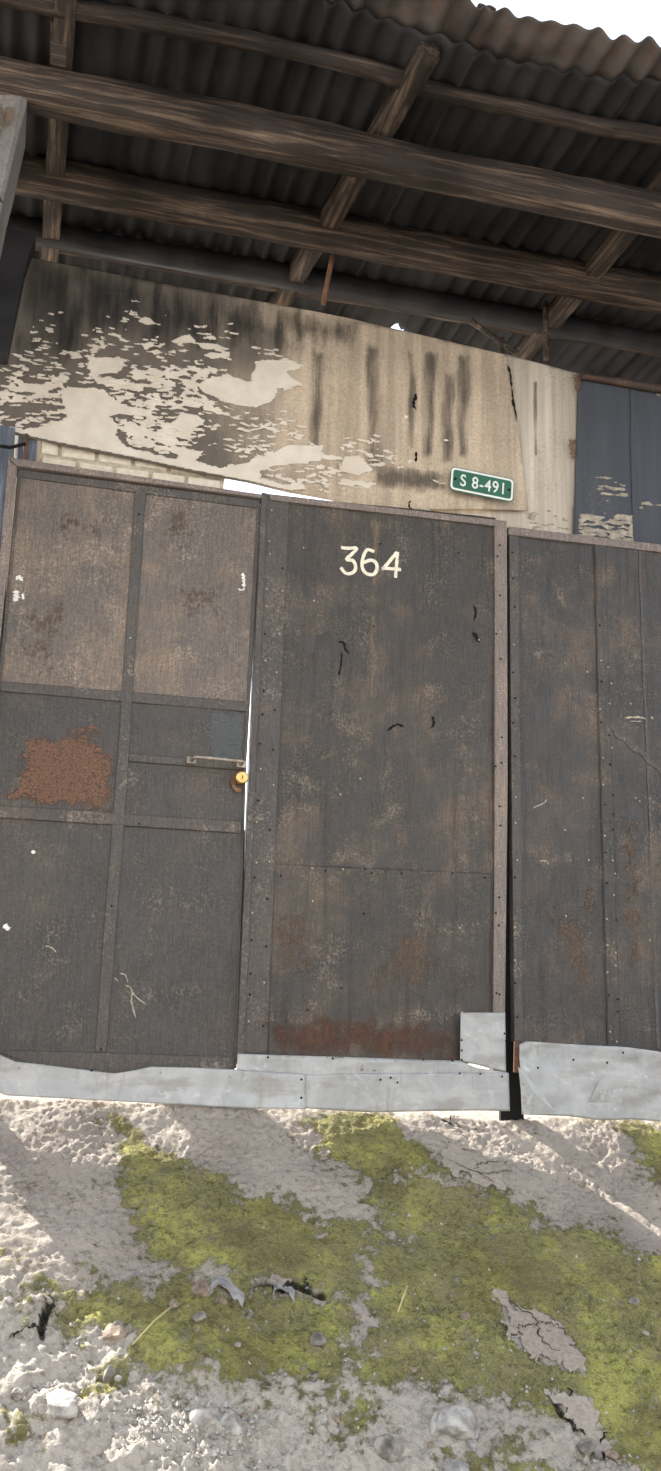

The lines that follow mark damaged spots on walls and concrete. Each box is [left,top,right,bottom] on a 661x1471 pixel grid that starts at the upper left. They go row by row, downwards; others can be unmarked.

peeling [0,300,414,495]
peeling [527,476,661,541]
corrosion [6,725,114,812]